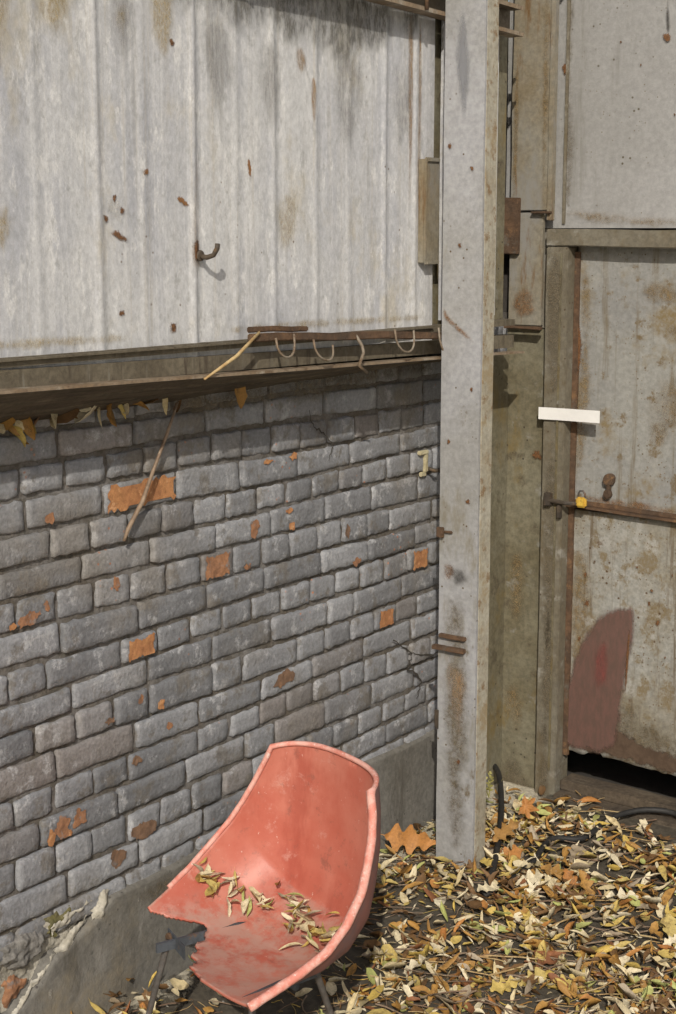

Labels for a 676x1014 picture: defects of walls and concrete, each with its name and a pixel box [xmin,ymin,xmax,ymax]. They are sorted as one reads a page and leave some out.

water stain [221,0,390,58]
corrosion [571,252,589,410]
spalling [108,475,176,513]
spalling [205,551,230,580]
corrosion [562,421,586,755]
spalling [129,632,155,662]
corrosion [585,714,676,773]
spalling [0,889,109,1014]